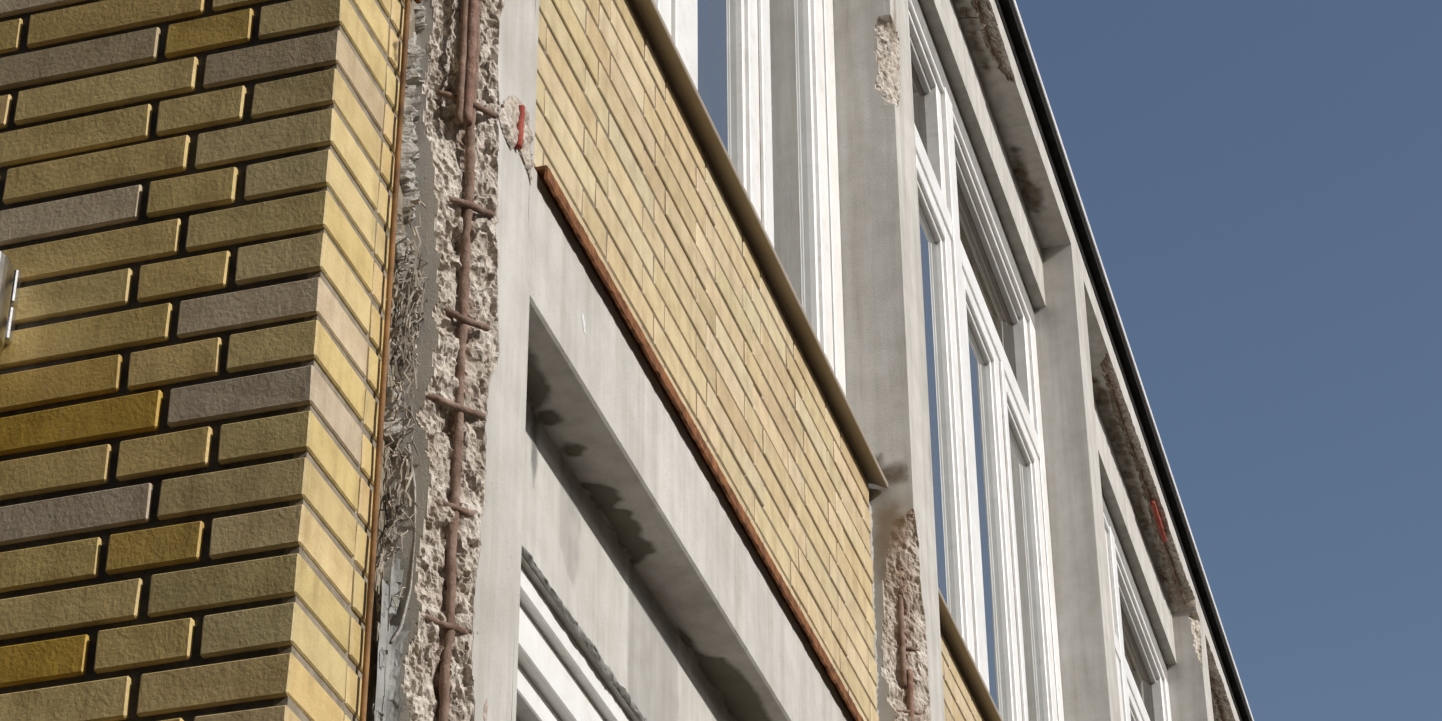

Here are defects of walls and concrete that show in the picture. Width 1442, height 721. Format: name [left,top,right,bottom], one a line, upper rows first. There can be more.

spalling [874,14,901,111]
spalling [375,0,534,721]
water stain [527,349,560,469]
water stain [564,445,584,456]
water stain [582,483,654,564]
spalling [1099,353,1235,721]
spalling [880,509,931,721]